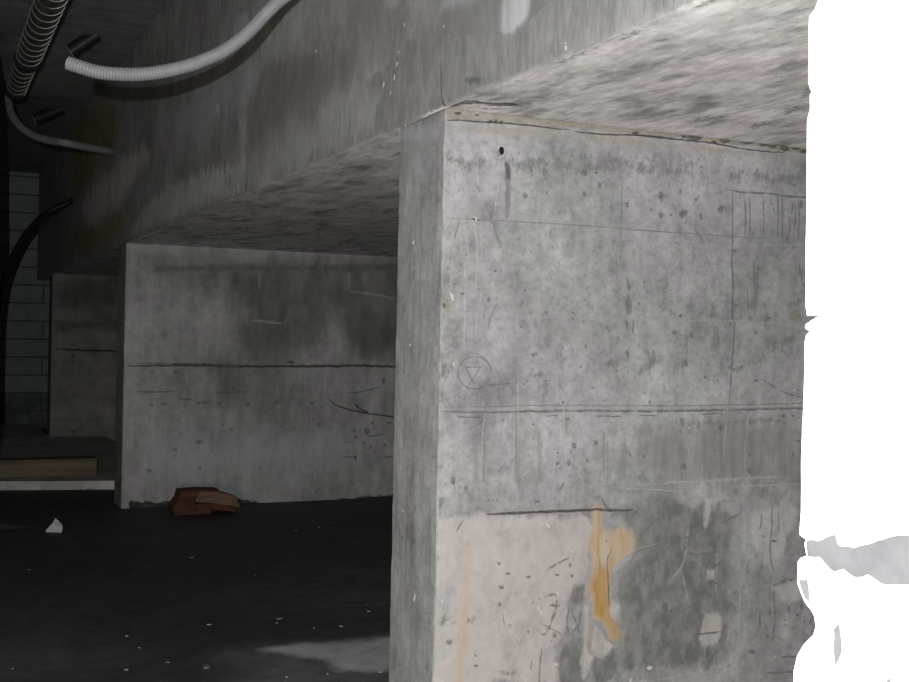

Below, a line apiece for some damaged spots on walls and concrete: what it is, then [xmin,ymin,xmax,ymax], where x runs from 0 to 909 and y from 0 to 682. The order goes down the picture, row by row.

crack [56,343,396,458]
corrosion [588,504,634,640]
leakage [623,409,803,682]